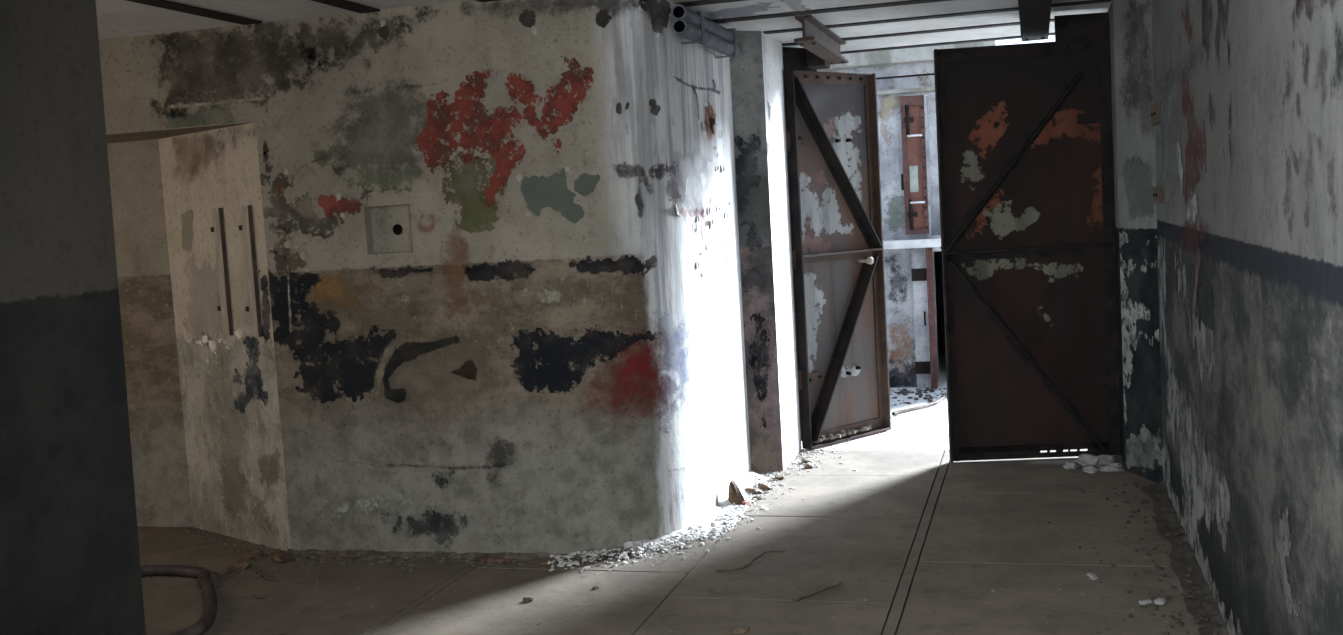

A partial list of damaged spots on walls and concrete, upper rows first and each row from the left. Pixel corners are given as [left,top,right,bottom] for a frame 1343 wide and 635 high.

peeling [516,167,600,223]
peeling [196,141,397,414]
peeling [370,265,434,278]
peeling [463,259,536,282]
peeling [569,255,657,276]
peeling [510,326,657,394]
peeling [1119,230,1241,635]